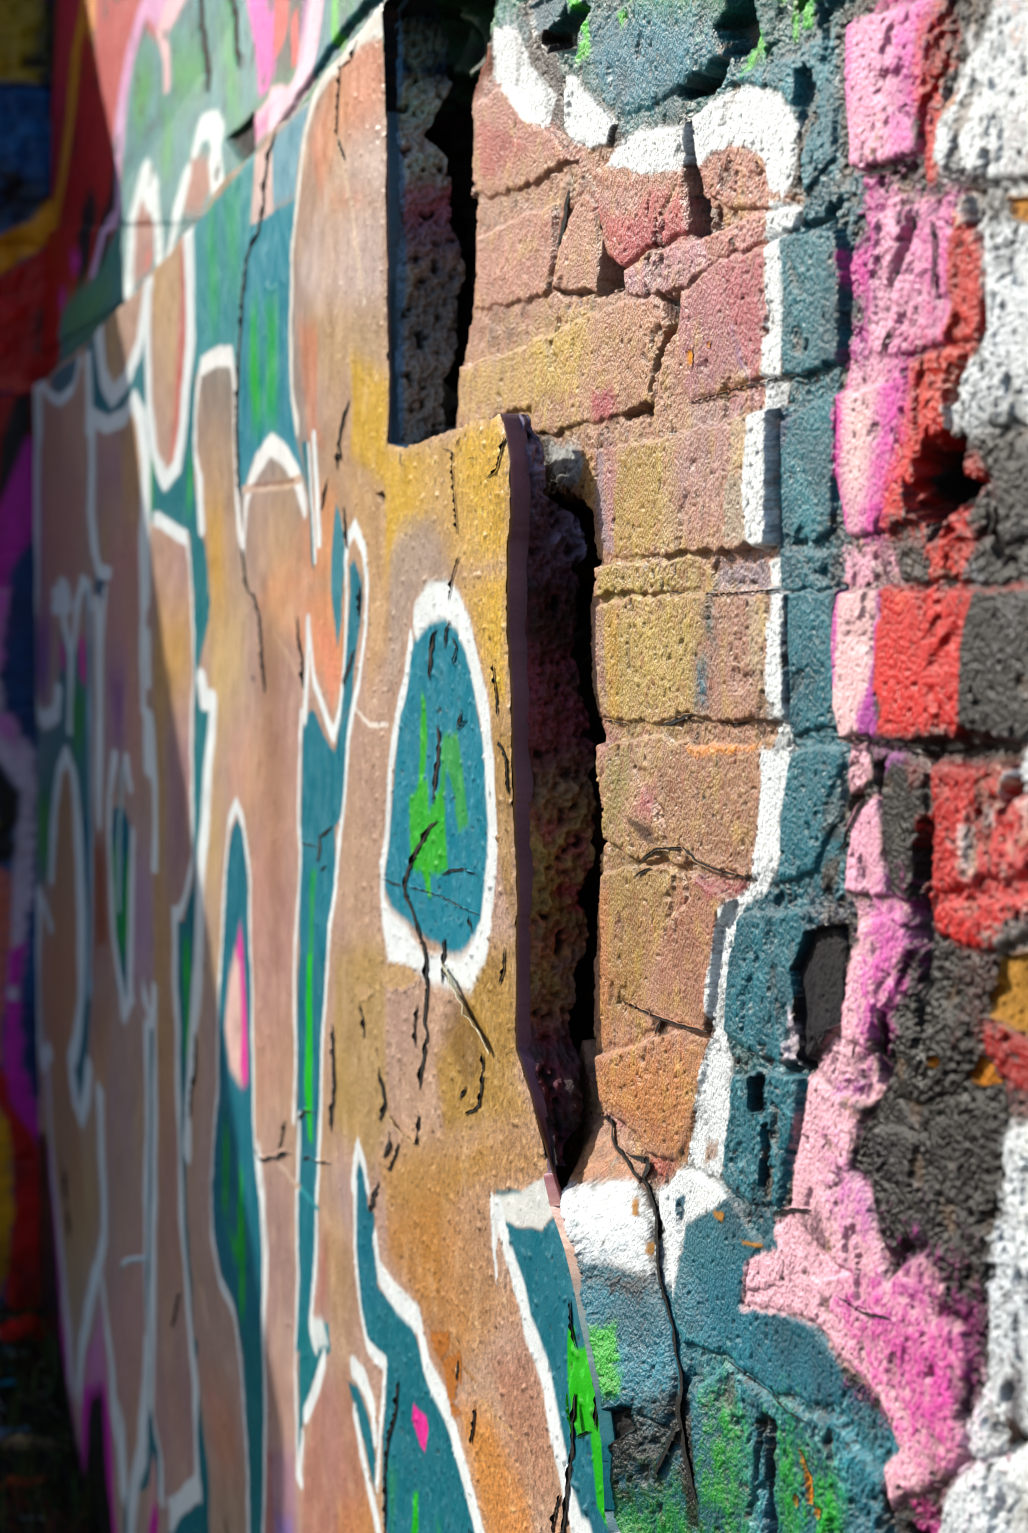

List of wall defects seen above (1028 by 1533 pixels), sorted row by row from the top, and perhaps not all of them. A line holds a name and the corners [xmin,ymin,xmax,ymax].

crack [234,129,276,495]
flaking render [395,0,465,446]
crack [427,436,505,680]
crack [253,664,508,1212]
crack [635,846,747,878]
crack [549,1301,597,1533]
crack [600,1112,696,1503]